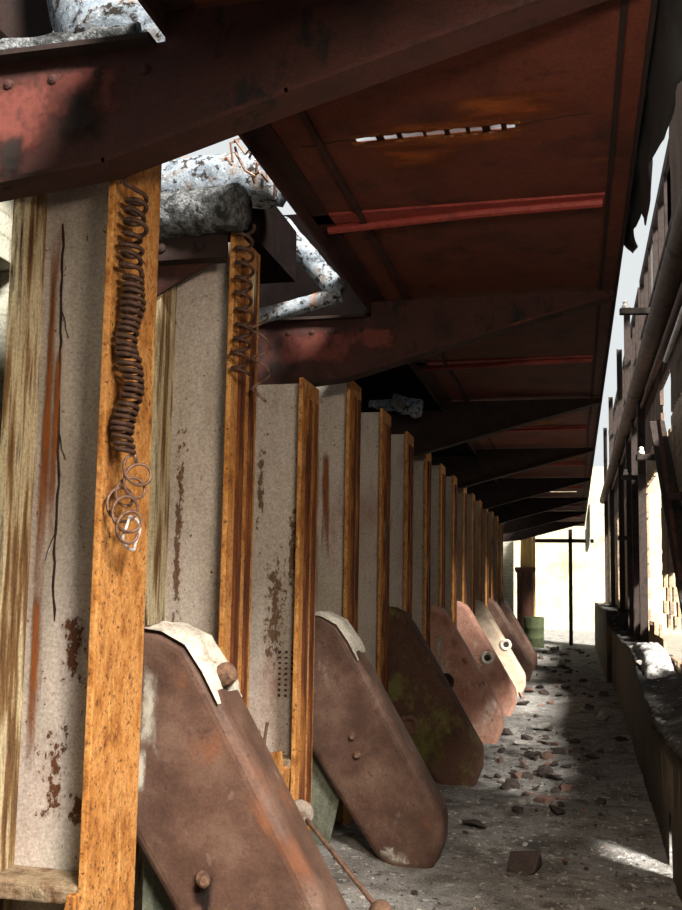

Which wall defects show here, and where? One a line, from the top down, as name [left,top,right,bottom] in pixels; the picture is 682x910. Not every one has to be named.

crack [59,224,69,357]
rust [37,260,61,564]
crack [45,403,66,621]
rust [28,599,39,736]
rust [61,616,87,689]
rust [40,725,82,826]